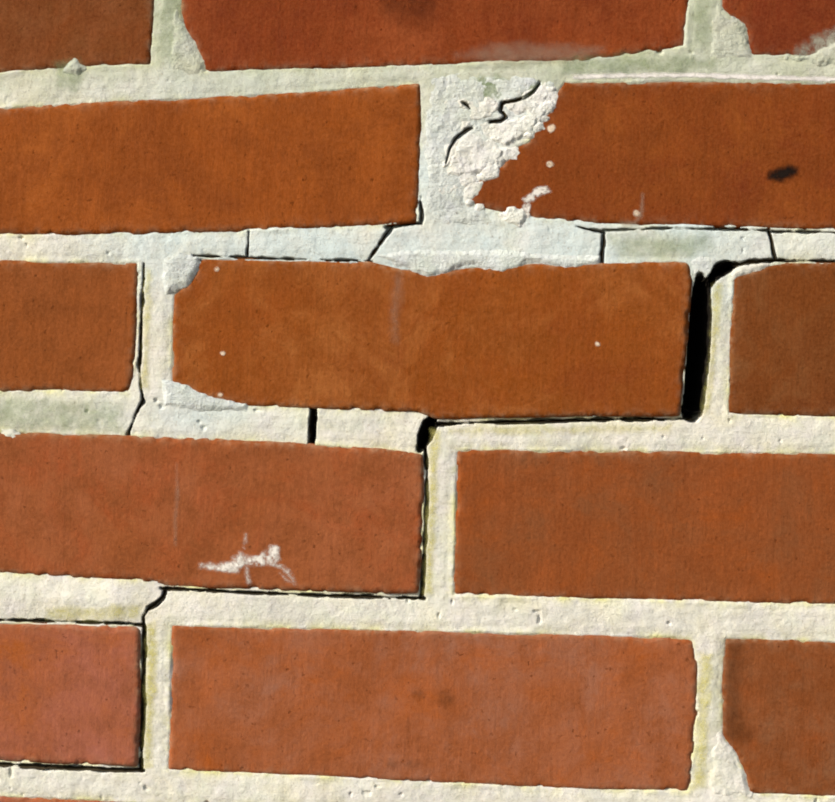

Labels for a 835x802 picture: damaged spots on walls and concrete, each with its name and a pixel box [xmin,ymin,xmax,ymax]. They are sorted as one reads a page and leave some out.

spalling [422,73,558,228]
crack [446,83,540,162]
crack [194,202,423,262]
crack [0,226,835,773]